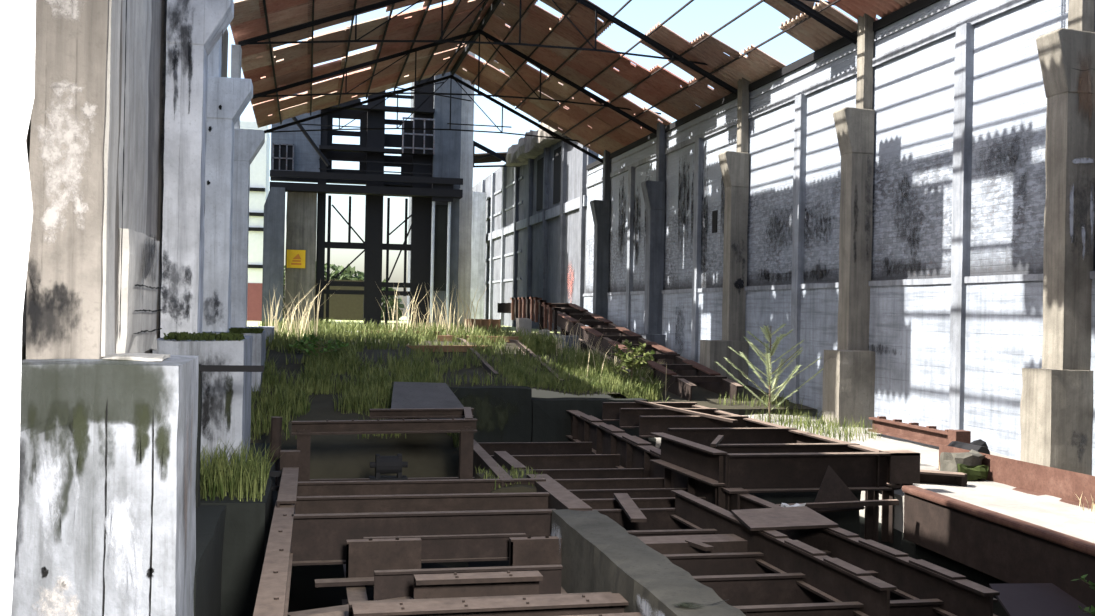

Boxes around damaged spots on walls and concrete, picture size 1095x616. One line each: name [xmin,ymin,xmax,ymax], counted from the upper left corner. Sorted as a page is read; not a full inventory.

damp [162,0,192,120]
damp [665,167,708,286]
damp [22,263,77,344]
damp [142,238,191,315]
damp [761,261,829,280]
damp [201,363,233,430]
damp [15,403,109,555]
damp [135,404,170,477]